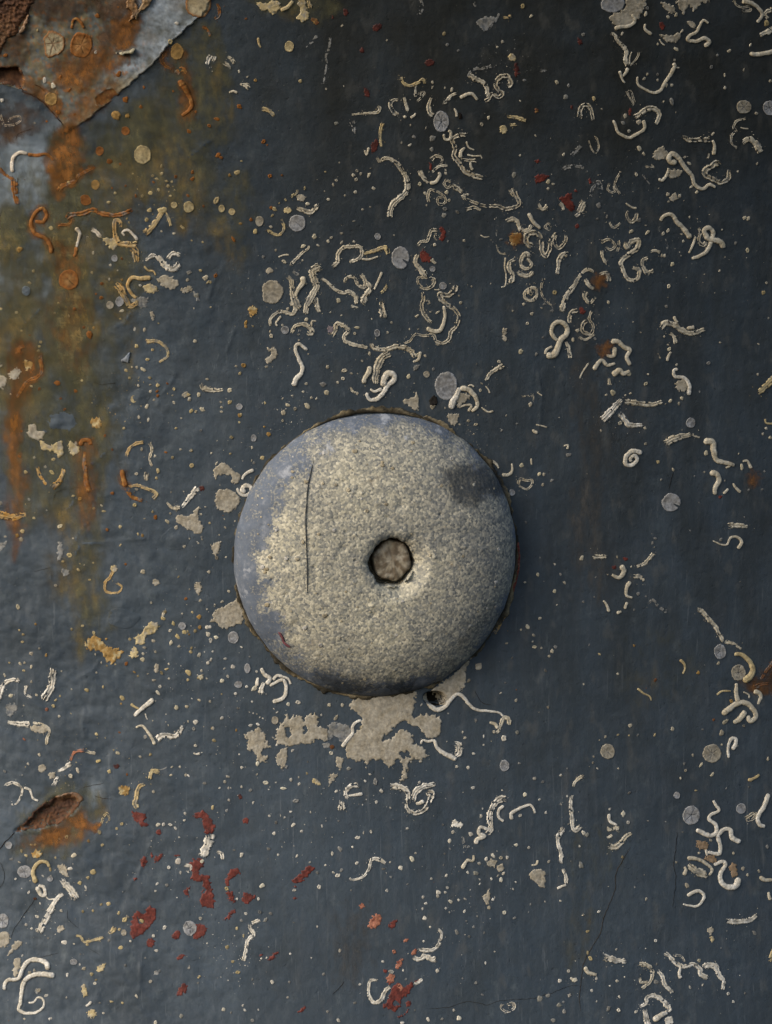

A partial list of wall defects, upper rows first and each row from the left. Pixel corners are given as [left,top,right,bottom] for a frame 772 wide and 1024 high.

peeling [0,0,198,127]
rust [0,0,141,391]
rust [5,342,35,482]
spalling [423,691,445,706]
spalling [16,792,83,832]